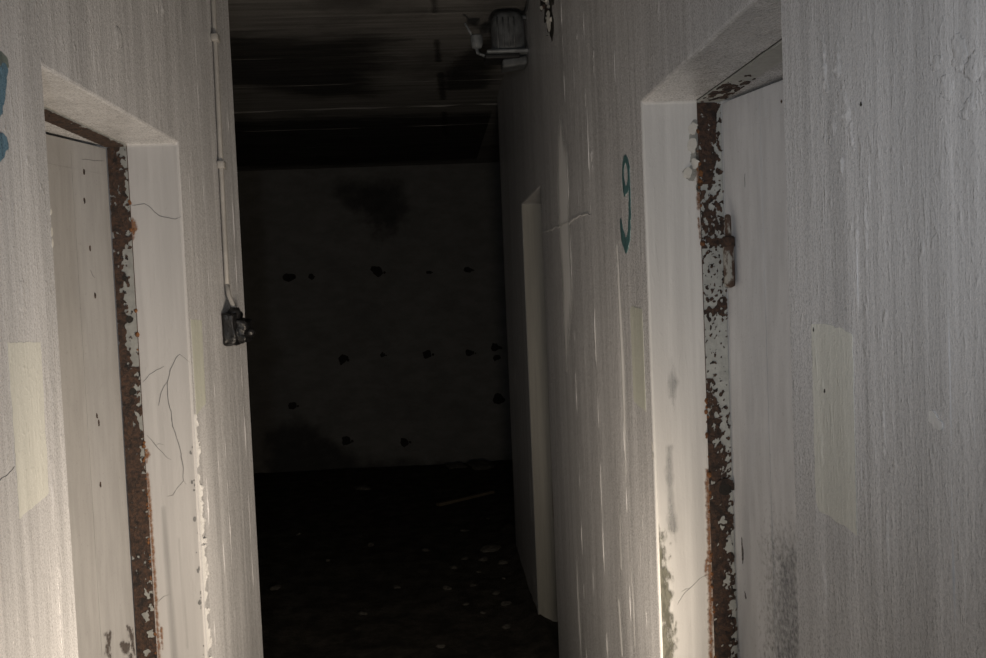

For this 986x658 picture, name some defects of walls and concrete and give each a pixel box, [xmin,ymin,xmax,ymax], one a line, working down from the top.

corrosion [44,109,163,658]
peeling [682,119,700,192]
corrosion [696,75,756,658]